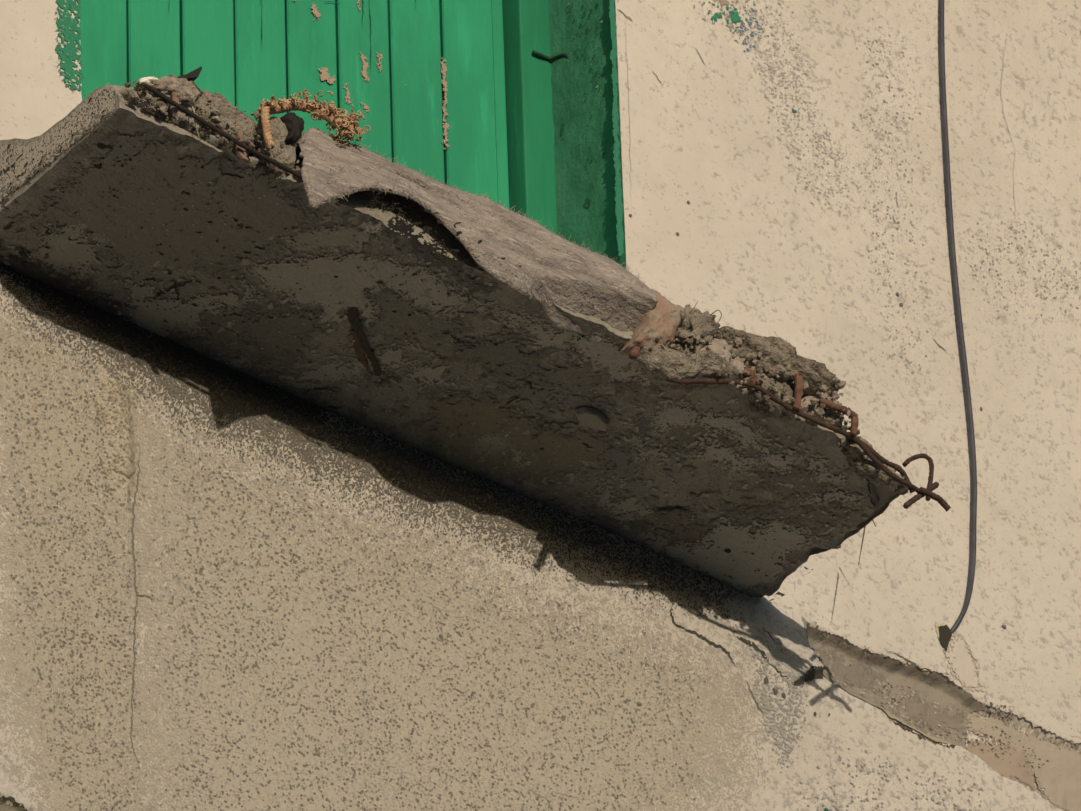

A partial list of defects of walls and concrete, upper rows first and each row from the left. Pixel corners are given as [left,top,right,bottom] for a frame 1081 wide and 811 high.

rust [347,308,381,376]
rust [819,397,858,418]
crack [670,608,825,715]
spalling [764,617,1081,811]
crack [822,631,1081,748]